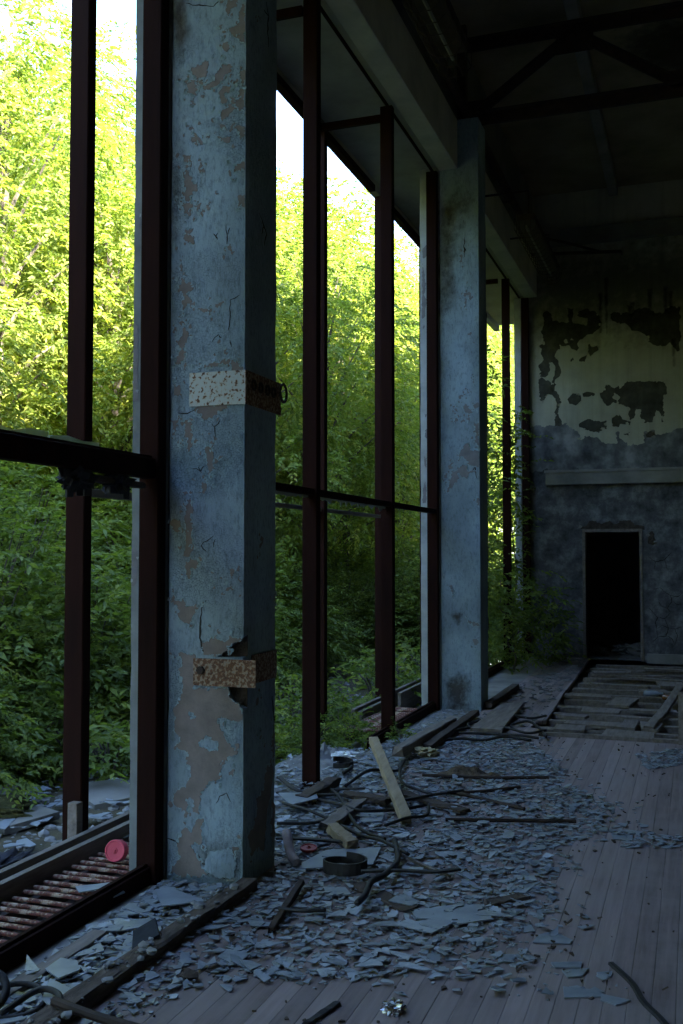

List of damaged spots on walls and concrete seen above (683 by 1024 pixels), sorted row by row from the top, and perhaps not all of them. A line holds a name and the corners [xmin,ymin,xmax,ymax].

peeling [170,0,247,397]
peeling [530,306,683,473]
crack [198,601,206,652]
peeling [163,624,248,880]